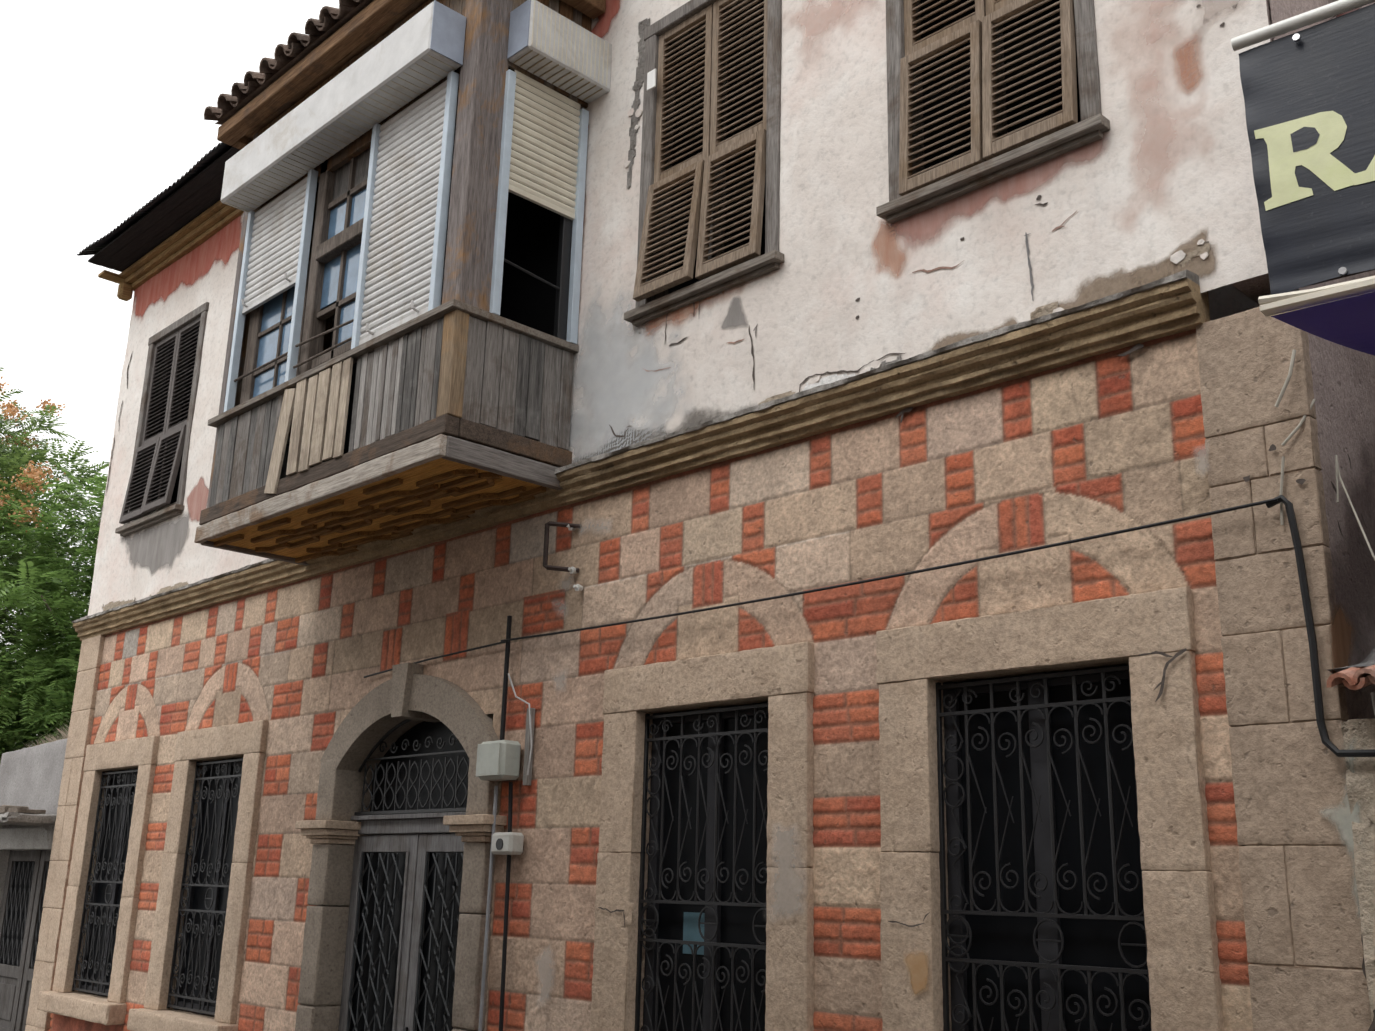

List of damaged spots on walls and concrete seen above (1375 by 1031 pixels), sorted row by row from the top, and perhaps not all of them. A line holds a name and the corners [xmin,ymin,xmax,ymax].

spalling [624,18,650,189]
crack [912,261,963,273]
crack [1024,202,1077,300]
crack [645,303,700,372]
crack [727,324,758,382]